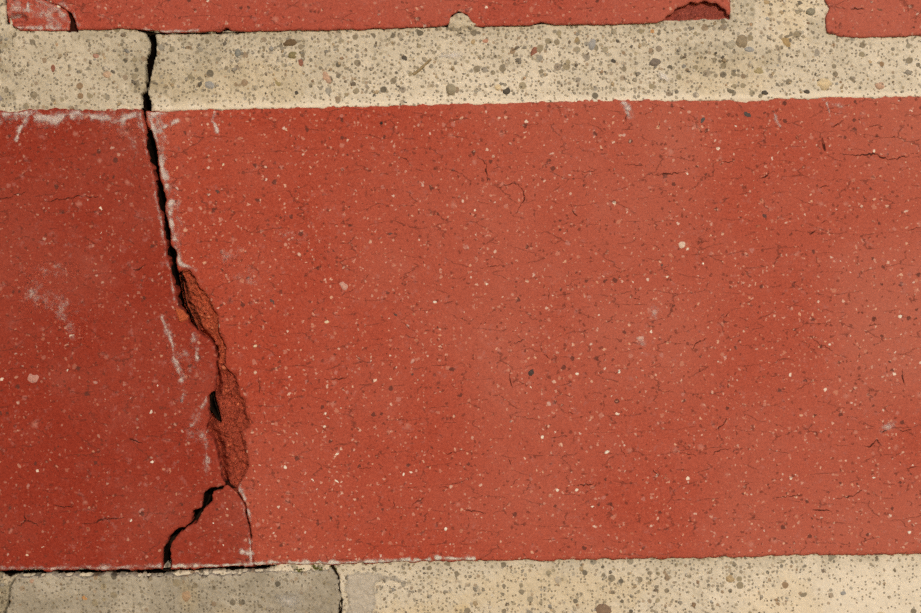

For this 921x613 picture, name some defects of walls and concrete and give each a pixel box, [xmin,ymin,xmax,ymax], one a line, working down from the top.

spalling [663,2,729,21]
crack [136,29,245,330]
crack [210,392,221,421]
crack [162,481,252,571]
crack [331,565,343,613]